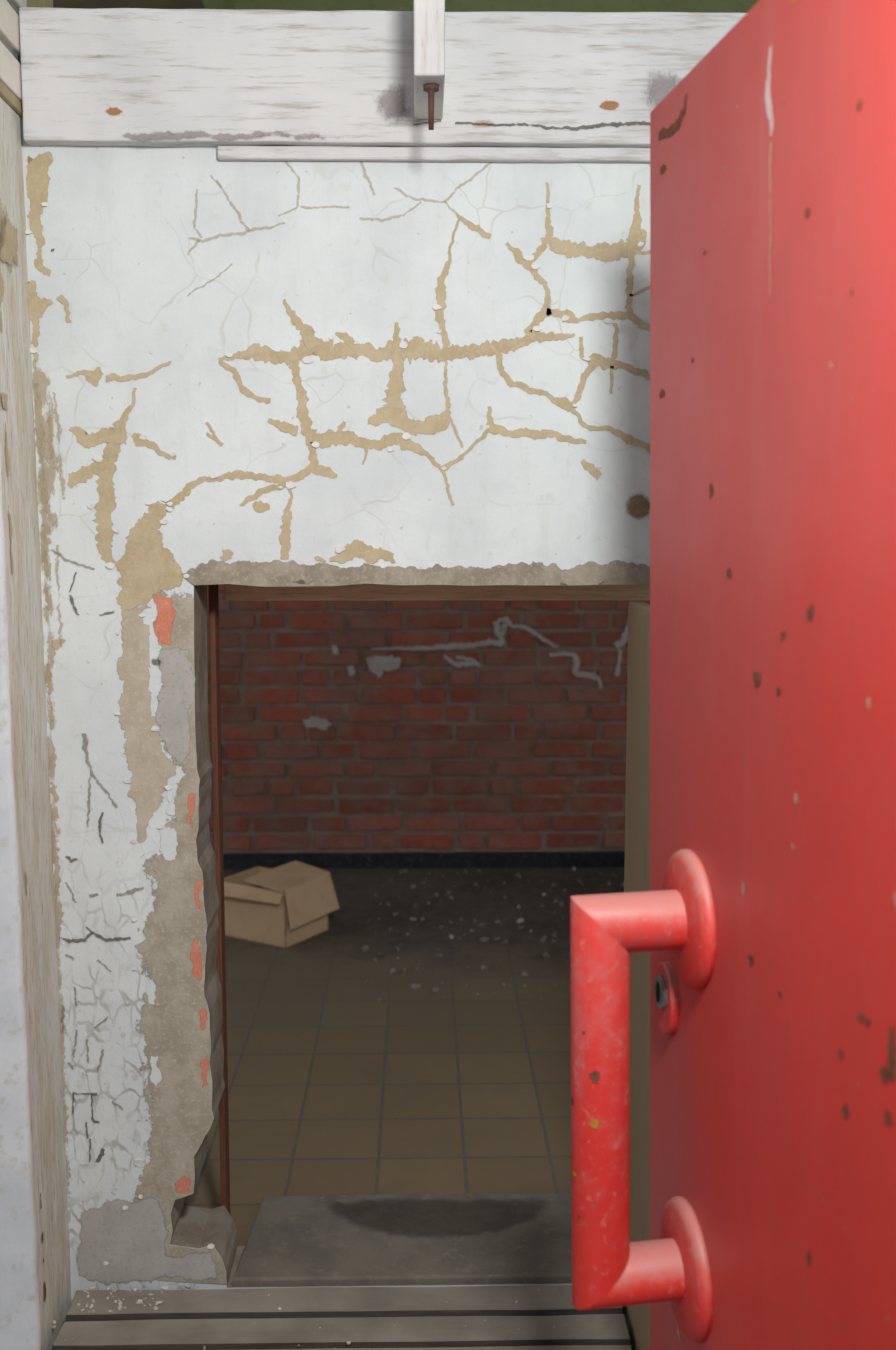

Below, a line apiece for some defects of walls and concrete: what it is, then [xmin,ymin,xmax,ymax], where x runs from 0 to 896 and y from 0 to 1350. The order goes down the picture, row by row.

peeling [66,361,171,387]
peeling [267,418,299,436]
peeling [581,459,602,480]
peeling [0,151,72,1194]
leakage [331,616,628,689]
spalling [106,496,650,1288]
crack [59,733,144,1162]